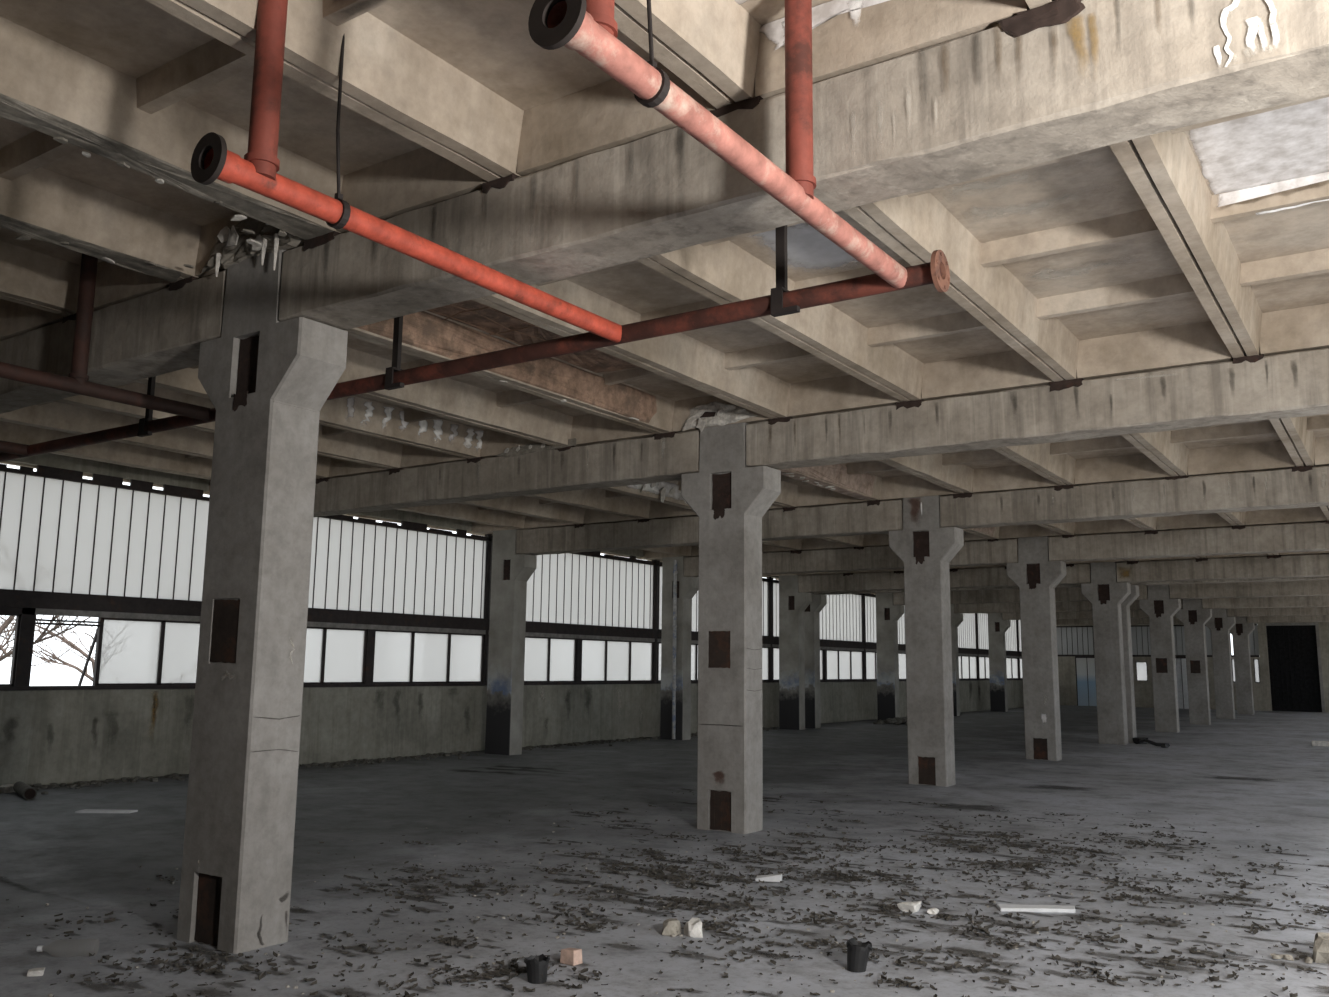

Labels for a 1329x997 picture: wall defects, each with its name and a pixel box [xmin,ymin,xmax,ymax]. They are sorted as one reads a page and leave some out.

peeling [759,17,785,50]
peeling [812,0,889,29]
efflorescence [1214,0,1279,66]
efflorescence [347,397,484,449]